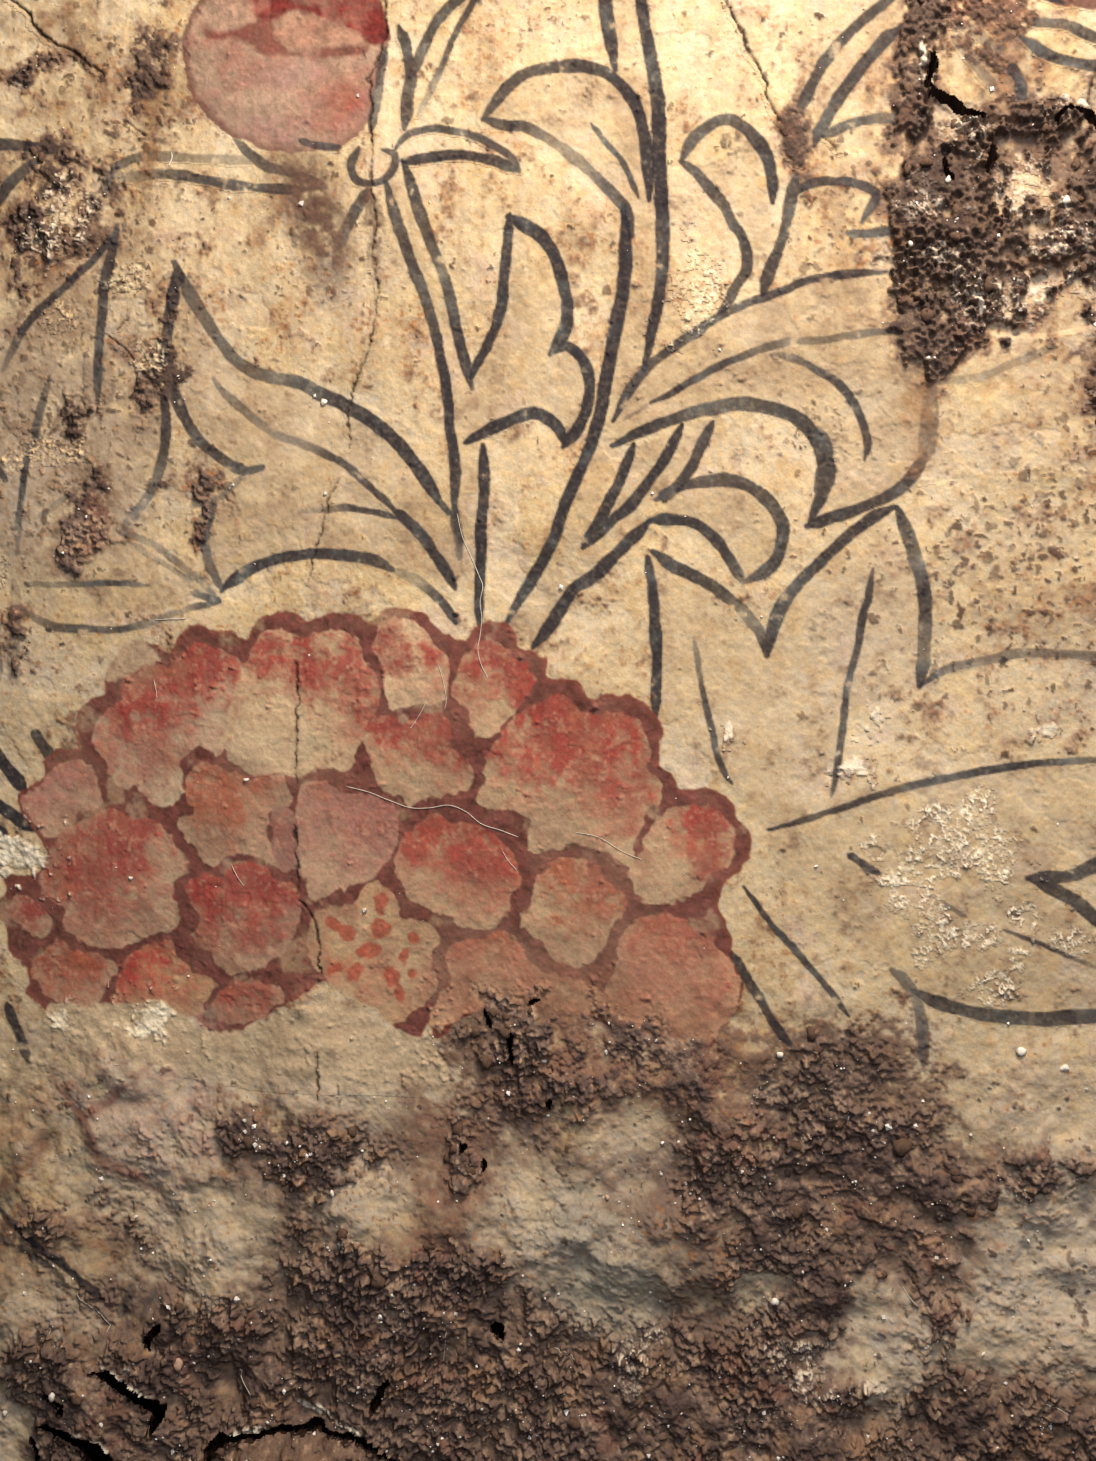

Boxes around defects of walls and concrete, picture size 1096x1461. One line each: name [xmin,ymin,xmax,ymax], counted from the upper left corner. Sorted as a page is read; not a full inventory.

crack [721,0,908,218]
crack [924,51,998,181]
crack [304,0,392,587]
water stain [877,78,1096,487]
water stain [846,778,1096,1007]
water stain [436,934,743,1115]
water stain [0,1251,60,1307]
crack [29,1395,112,1461]
crack [86,1370,167,1441]
crack [203,1379,397,1461]
water stain [513,1165,688,1404]
water stain [748,1325,891,1408]